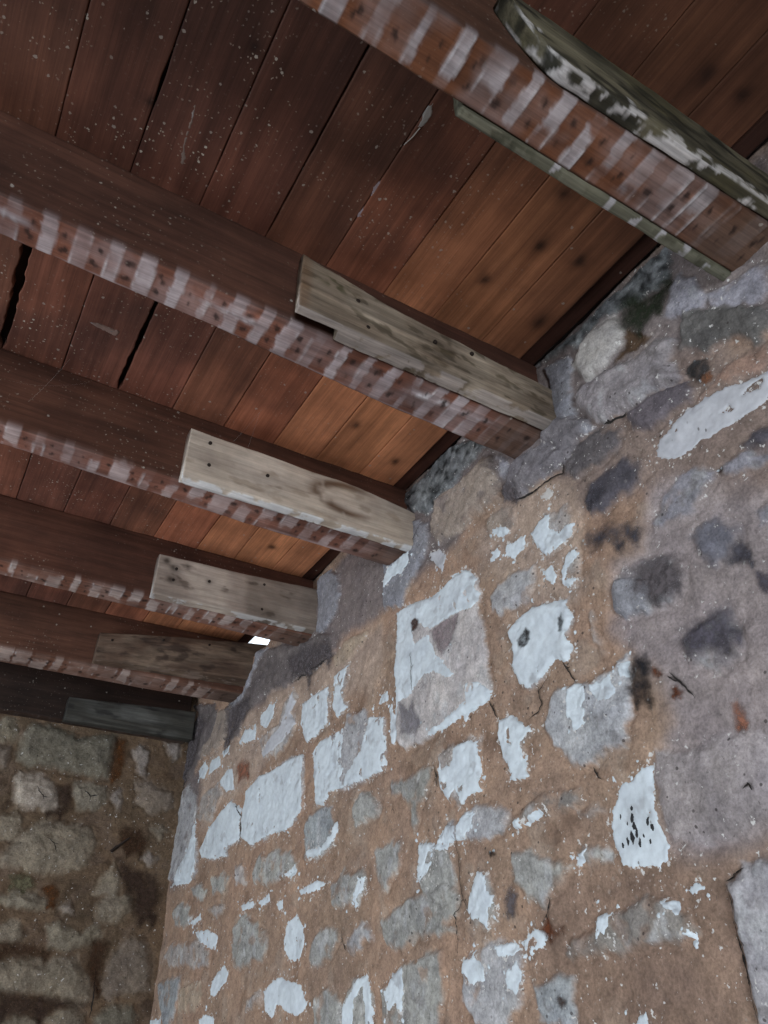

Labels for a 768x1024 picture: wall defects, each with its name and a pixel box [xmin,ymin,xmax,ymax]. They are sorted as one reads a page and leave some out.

crack [516,465,564,500]